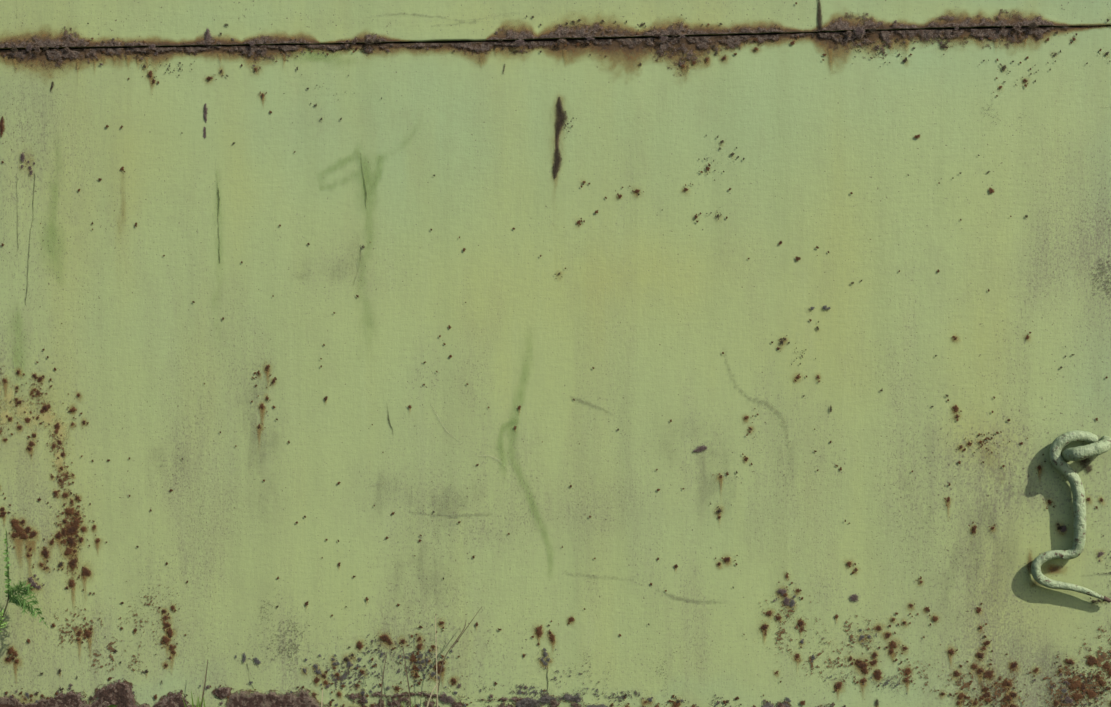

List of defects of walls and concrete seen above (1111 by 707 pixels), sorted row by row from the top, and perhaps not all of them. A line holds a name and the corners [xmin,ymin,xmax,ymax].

rust [0,9,1111,97]
rust [251,365,278,438]
rust [956,419,1028,468]
rust [5,647,20,674]
rust [155,606,187,684]
rust [289,614,472,707]
rust [610,693,696,707]
rust [761,572,828,663]
rust [824,603,938,707]
rust [938,603,1111,707]